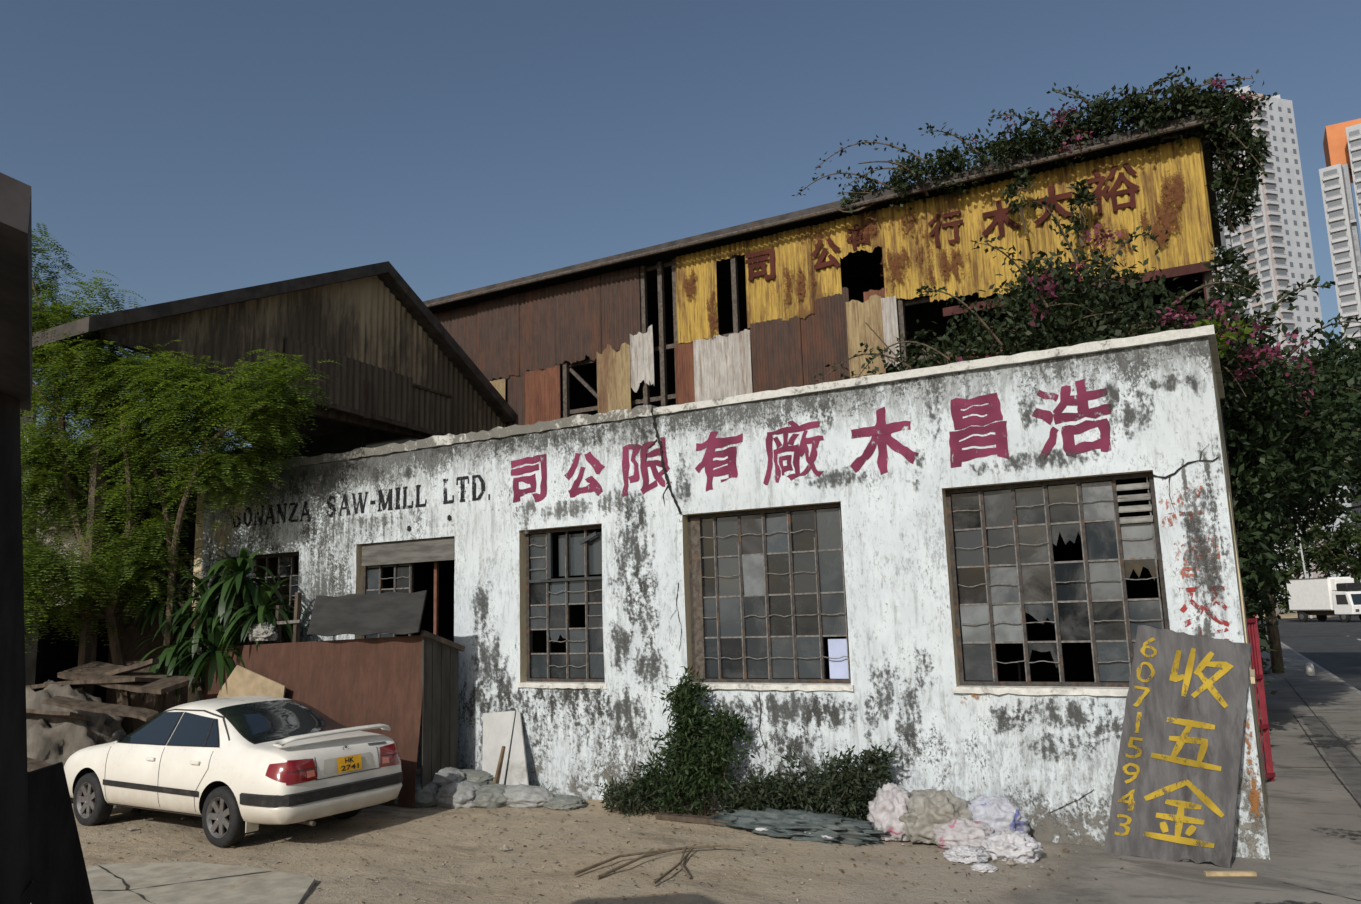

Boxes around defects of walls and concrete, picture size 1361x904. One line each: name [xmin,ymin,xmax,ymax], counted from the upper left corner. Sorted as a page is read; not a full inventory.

rust [1085,169,1187,266]
rust [679,269,718,340]
rust [772,262,816,307]
leakage [1018,388,1044,428]
leakage [1100,374,1198,438]
crack [645,407,681,514]
crack [1152,447,1219,509]
leakage [502,493,668,805]
leakage [712,649,933,821]
leakage [990,697,1122,761]